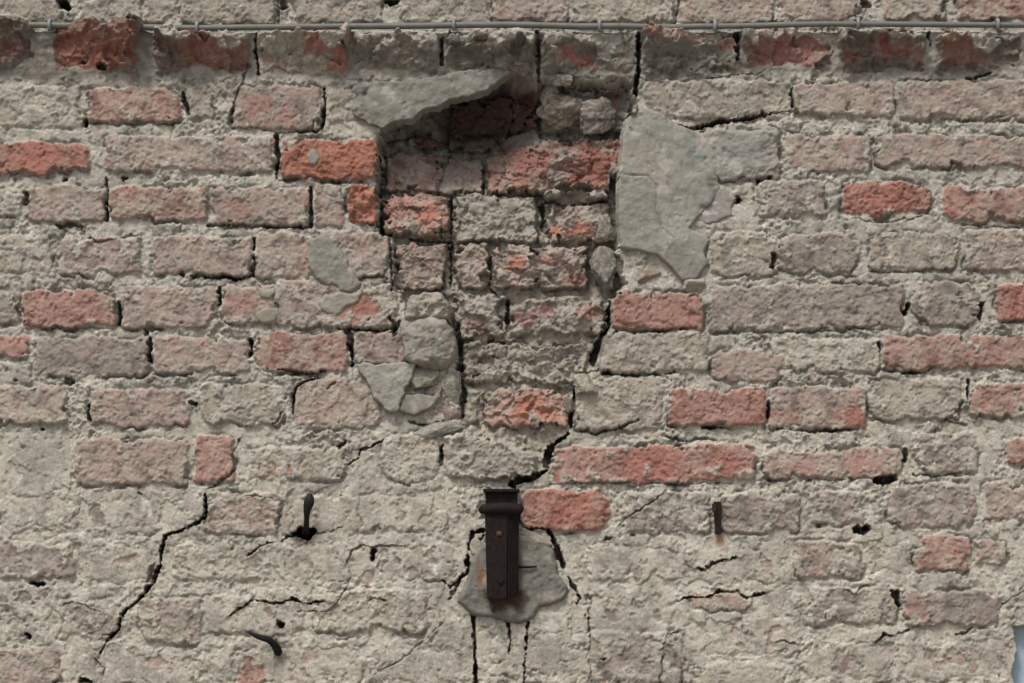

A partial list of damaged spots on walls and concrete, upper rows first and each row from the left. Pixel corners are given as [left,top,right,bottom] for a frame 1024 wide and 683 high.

crack [678,109,802,131]
spalling [377,74,637,458]
crack [587,300,612,367]
crack [508,387,577,489]
crack [63,437,278,678]
crack [228,525,411,617]
crack [526,525,594,683]
crack [676,555,766,602]
crack [504,621,531,683]